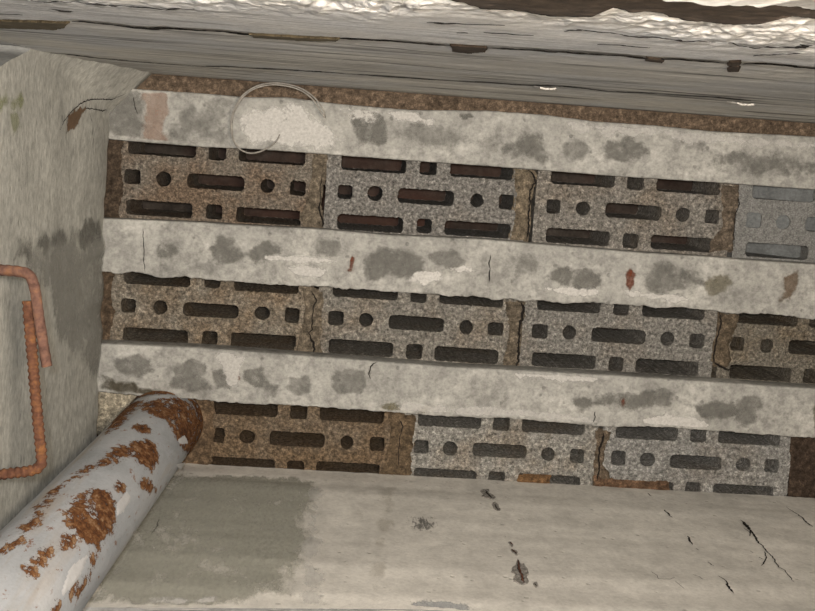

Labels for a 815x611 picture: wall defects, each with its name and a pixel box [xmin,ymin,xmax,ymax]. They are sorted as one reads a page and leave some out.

peeling [0,0,815,106]
crack [308,293,317,352]
crack [713,312,735,371]
crack [593,412,604,481]
damp [90,474,319,605]
crack [652,536,734,593]
crack [741,520,794,582]